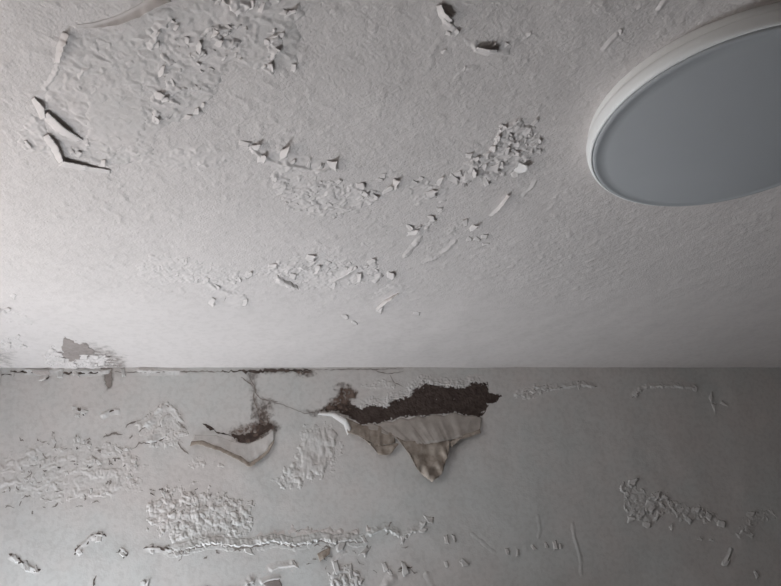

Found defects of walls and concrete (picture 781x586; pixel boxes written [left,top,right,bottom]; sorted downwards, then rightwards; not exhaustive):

peeling [436,4,512,56]
peeling [17,0,305,173]
peeling [238,117,542,265]
peeling [265,254,418,314]
spalling [31,337,122,381]
spalling [103,398,278,469]
spalling [318,374,502,482]
peeling [141,480,434,586]